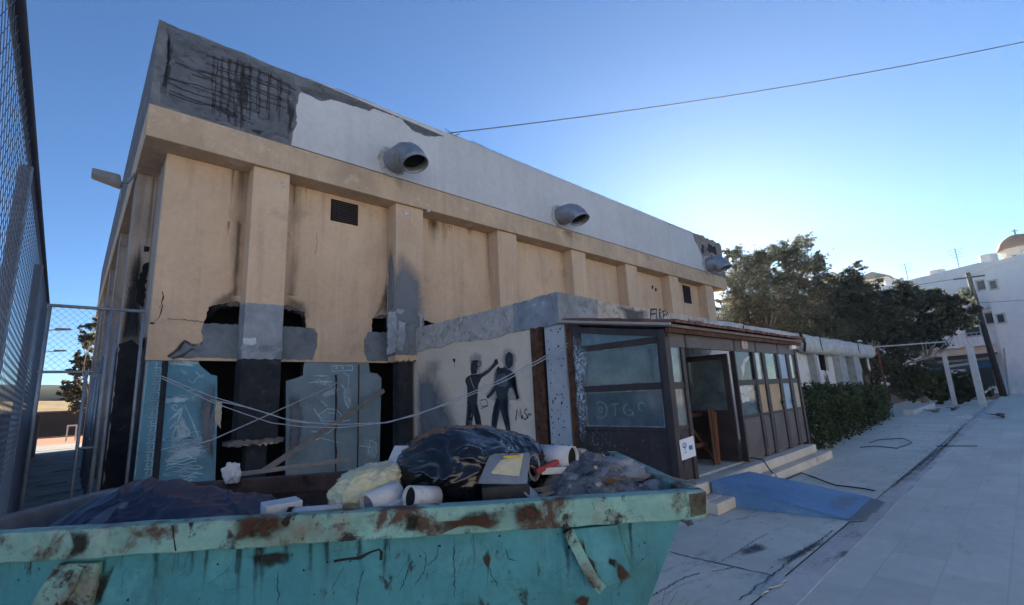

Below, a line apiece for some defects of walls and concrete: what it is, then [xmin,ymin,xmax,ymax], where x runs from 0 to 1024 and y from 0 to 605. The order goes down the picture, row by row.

spalling [160,26,441,140]
crack [150,291,200,324]
peeling [225,301,299,360]